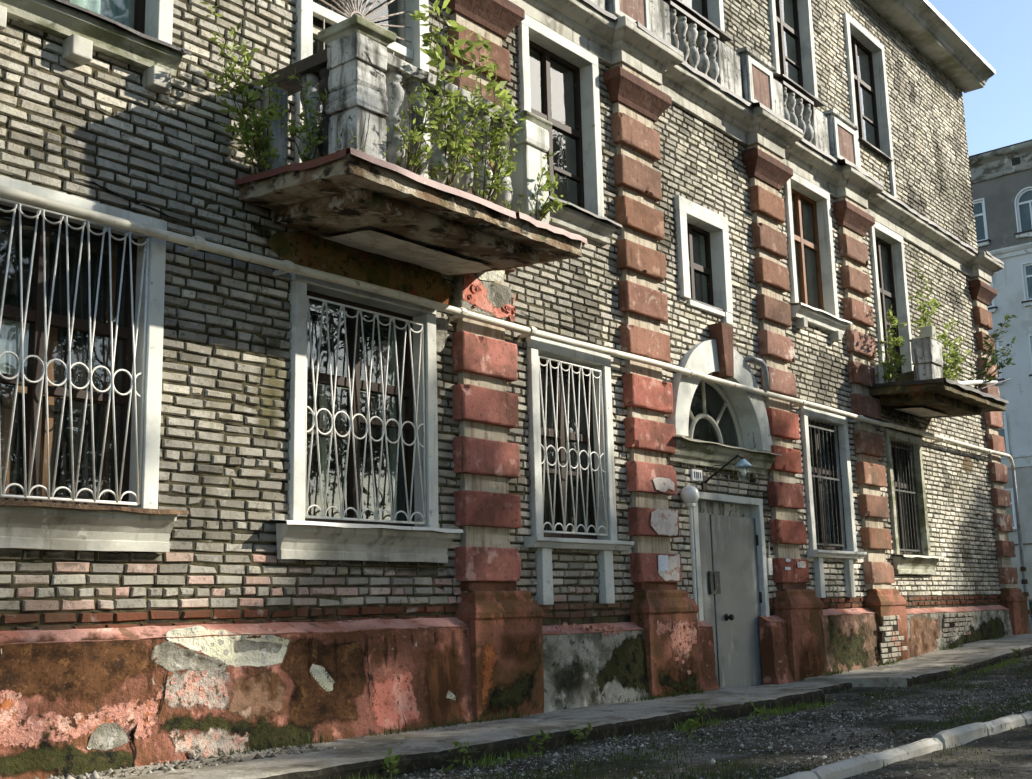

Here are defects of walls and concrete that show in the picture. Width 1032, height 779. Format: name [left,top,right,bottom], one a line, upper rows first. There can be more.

spalling [453,270,516,322]
peeling [656,618,697,674]
peeling [0,625,289,750]
spalling [310,664,335,691]
spalling [170,728,249,759]